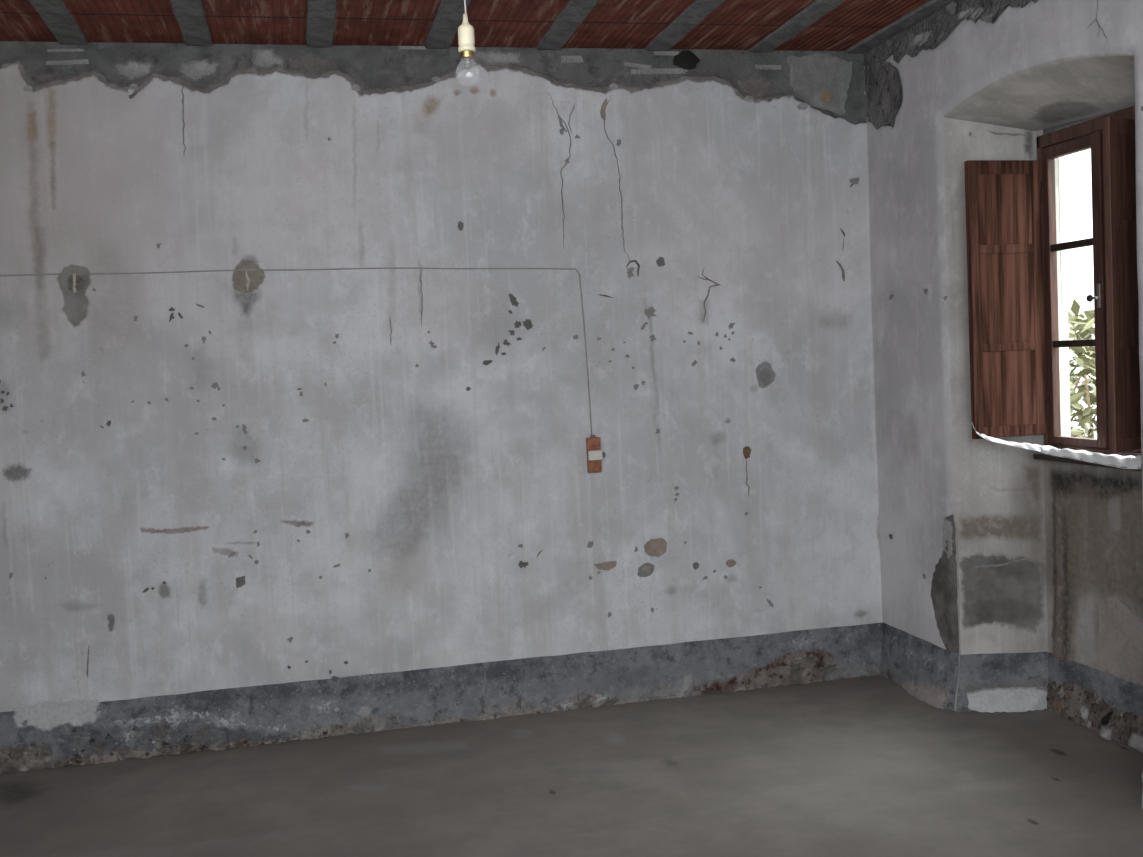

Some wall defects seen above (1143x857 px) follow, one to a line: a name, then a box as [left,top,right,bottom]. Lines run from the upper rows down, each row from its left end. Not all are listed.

flaking render [0,0,1038,130]
crack [548,93,632,263]
crack [641,307,656,341]
crack [699,267,720,321]
rust [743,446,751,496]
spalling [635,538,667,577]
spalling [923,514,959,662]
spalling [697,650,838,695]
peeling [0,694,627,773]
spalling [966,679,1143,753]